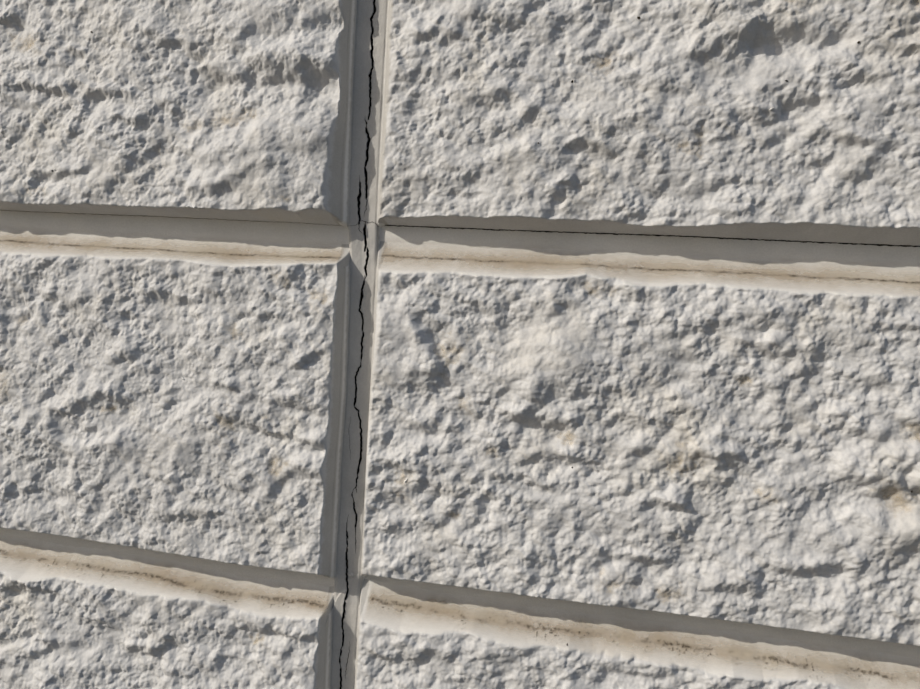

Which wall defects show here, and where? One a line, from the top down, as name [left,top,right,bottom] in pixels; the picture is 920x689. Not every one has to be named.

crack [286,0,920,689]